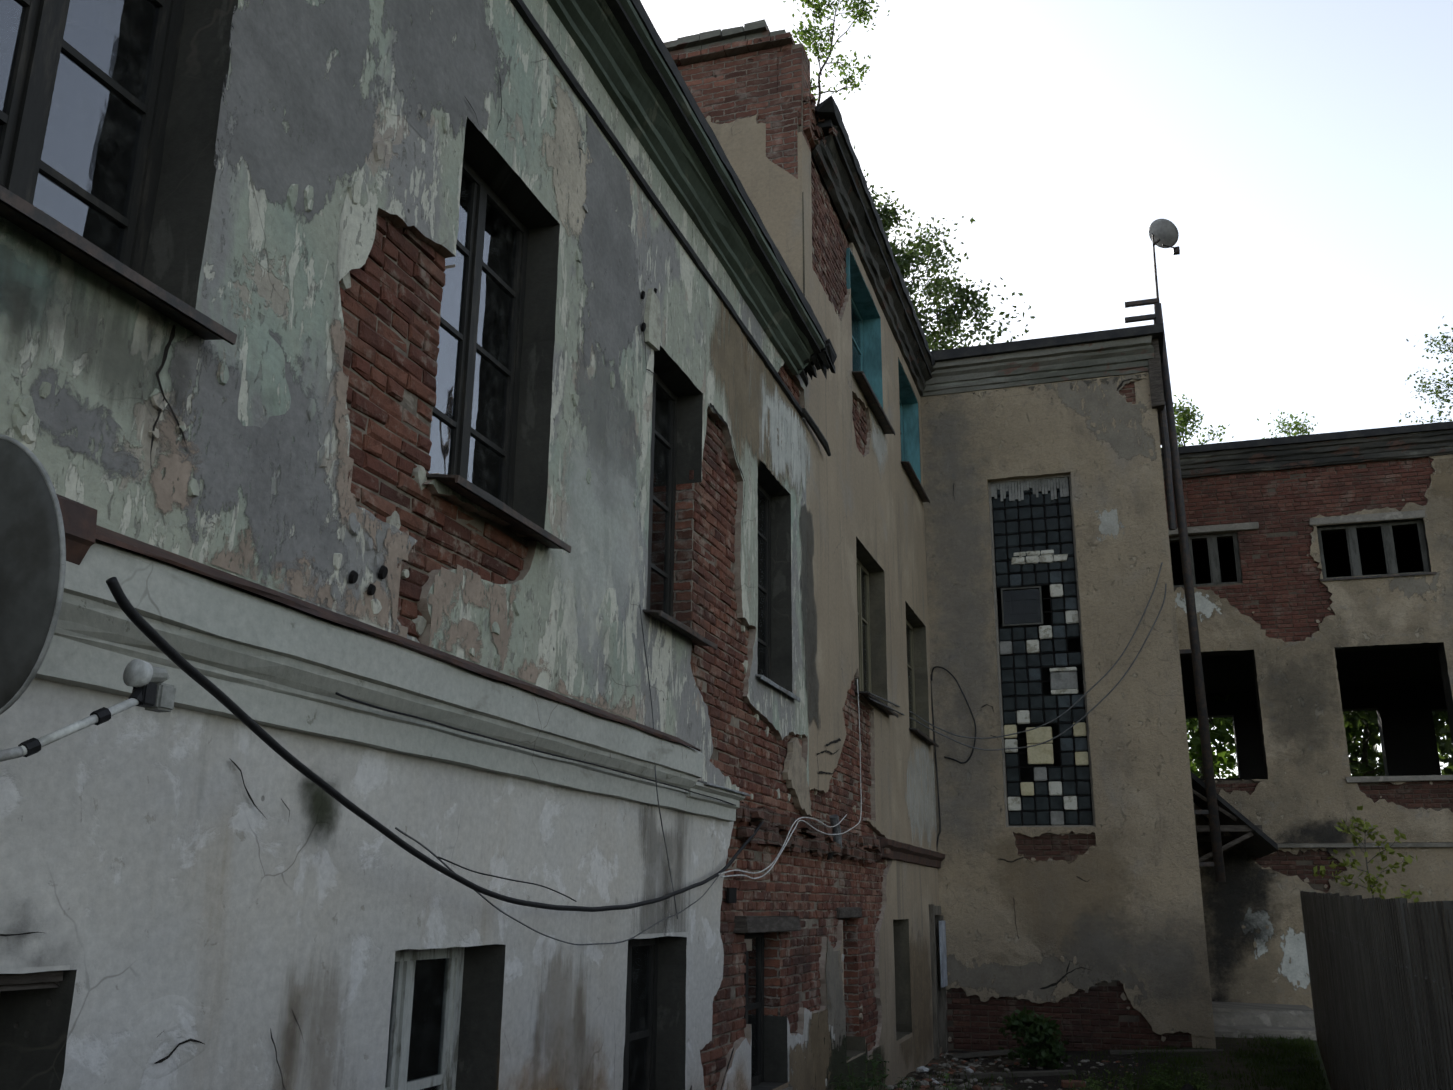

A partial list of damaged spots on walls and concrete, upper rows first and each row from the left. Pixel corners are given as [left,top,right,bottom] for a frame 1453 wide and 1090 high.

peeling [214,0,512,224]
spalling [745,43,850,316]
spalling [8,214,637,720]
peeling [541,75,661,513]
spalling [1119,382,1136,404]
spalling [1164,457,1441,642]
spalling [673,414,888,1090]
spalling [1013,831,1097,864]
spalling [946,980,1193,1052]
peeling [1242,907,1310,990]